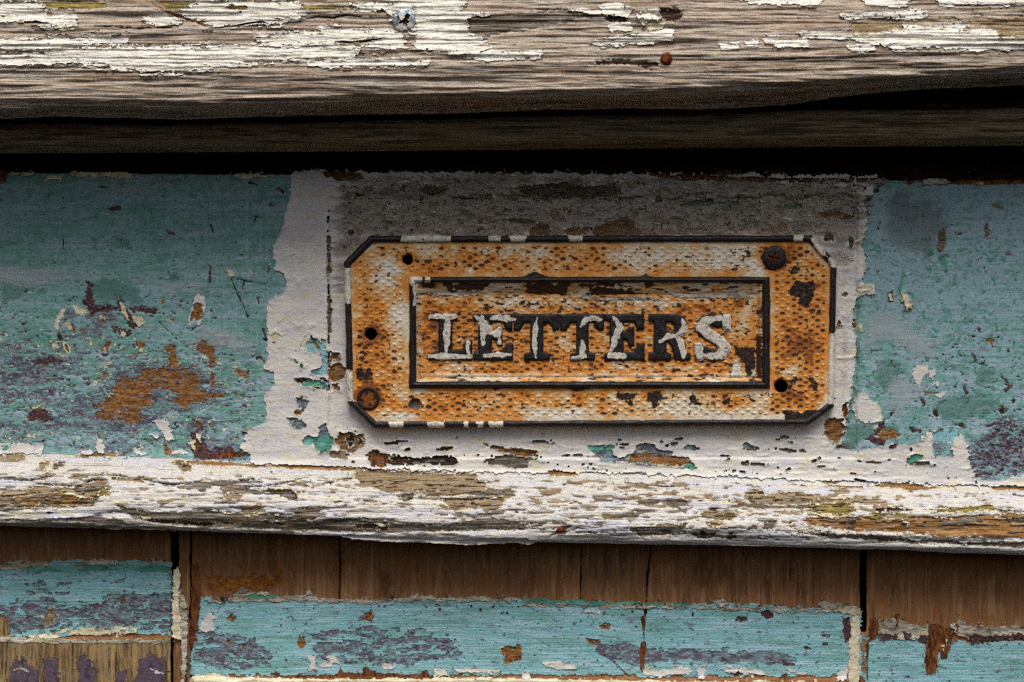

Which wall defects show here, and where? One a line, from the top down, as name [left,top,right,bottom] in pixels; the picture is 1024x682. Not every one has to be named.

peeling [0,0,683,78]
peeling [718,0,1024,53]
peeling [0,168,133,189]
peeling [230,172,284,207]
peeling [903,176,1024,187]
corrosion [361,390,376,407]
peeling [0,221,1024,549]
crack [0,441,1024,635]
peeling [0,555,1024,682]